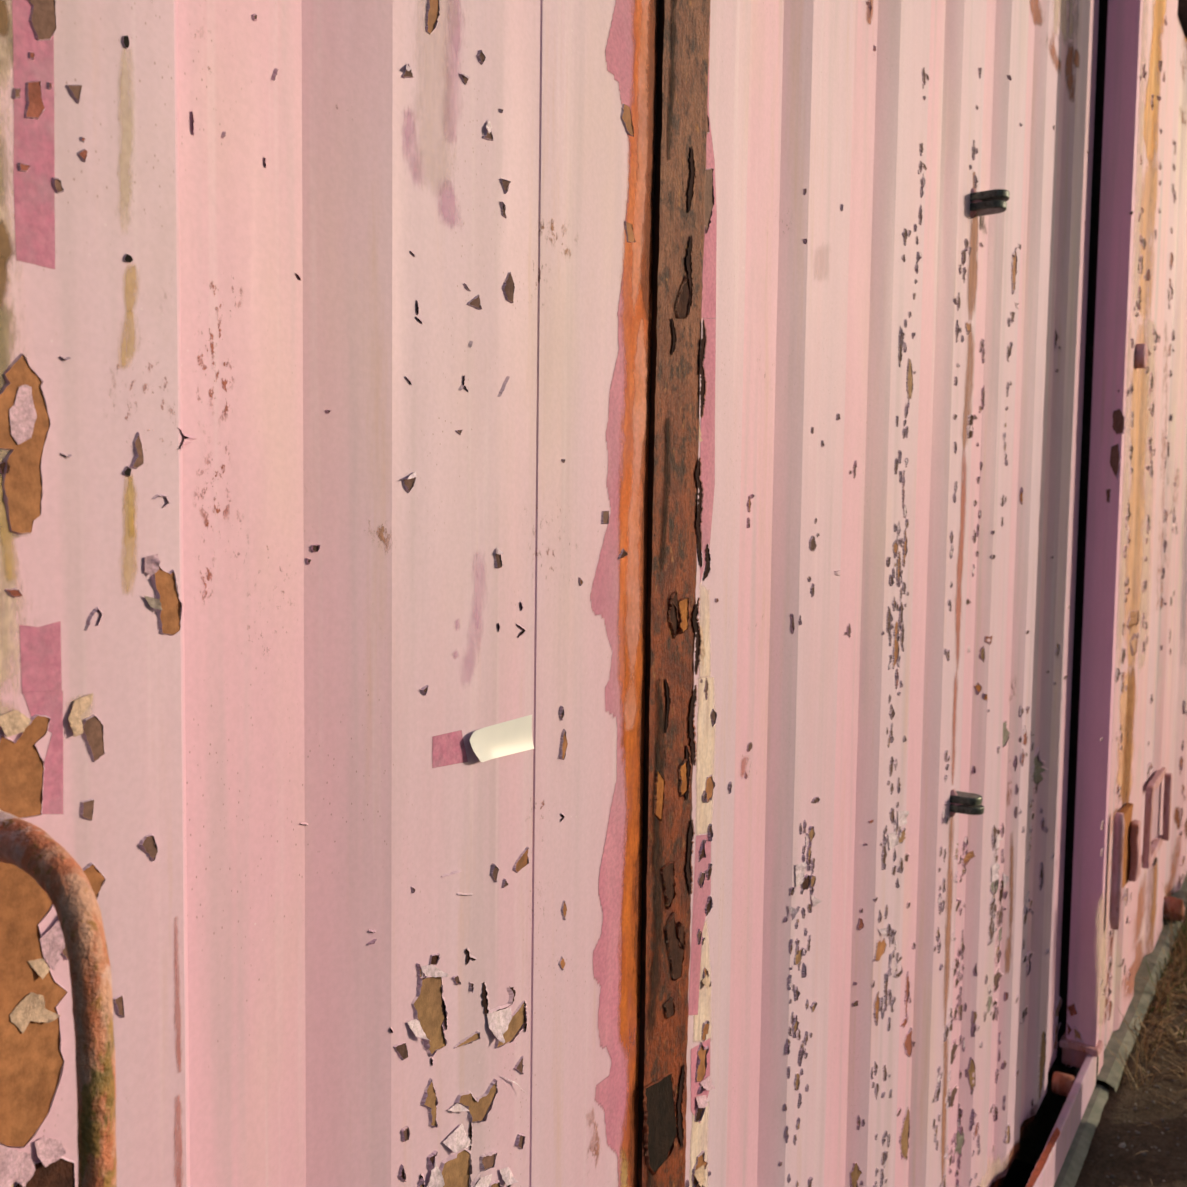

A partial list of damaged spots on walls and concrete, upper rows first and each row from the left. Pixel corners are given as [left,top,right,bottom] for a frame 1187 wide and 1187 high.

rust [0,220,13,308]
peeling [0,710,50,819]
peeling [0,353,51,598]
peeling [0,861,76,1187]
peeling [390,948,529,1187]
rust [619,0,695,1187]
rust [668,591,702,800]
peeling [864,143,927,888]
rust [944,216,985,782]
peeling [932,699,1055,1187]
rust [1100,0,1179,830]
rust [1097,808,1187,1023]